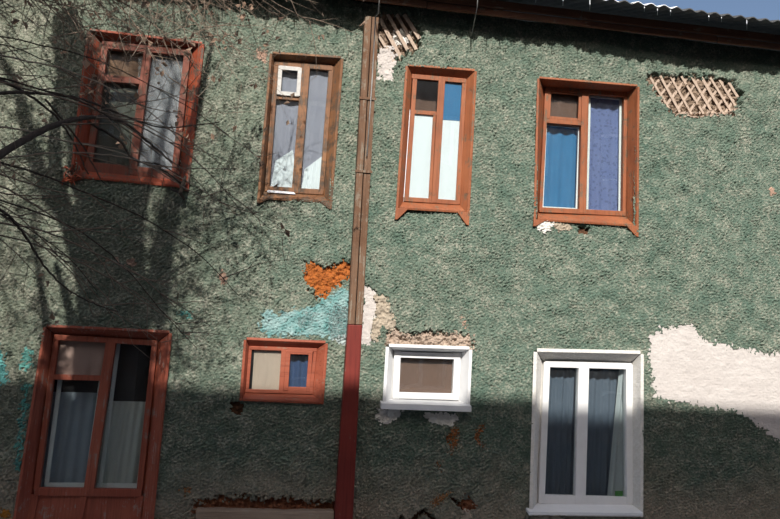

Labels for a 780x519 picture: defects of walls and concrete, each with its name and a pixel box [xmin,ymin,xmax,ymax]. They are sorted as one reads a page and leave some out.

peeling [257,259,350,345]
flaking render [361,285,476,353]
flaking render [647,323,780,443]
flaking render [178,486,335,515]
crack [408,508,436,519]